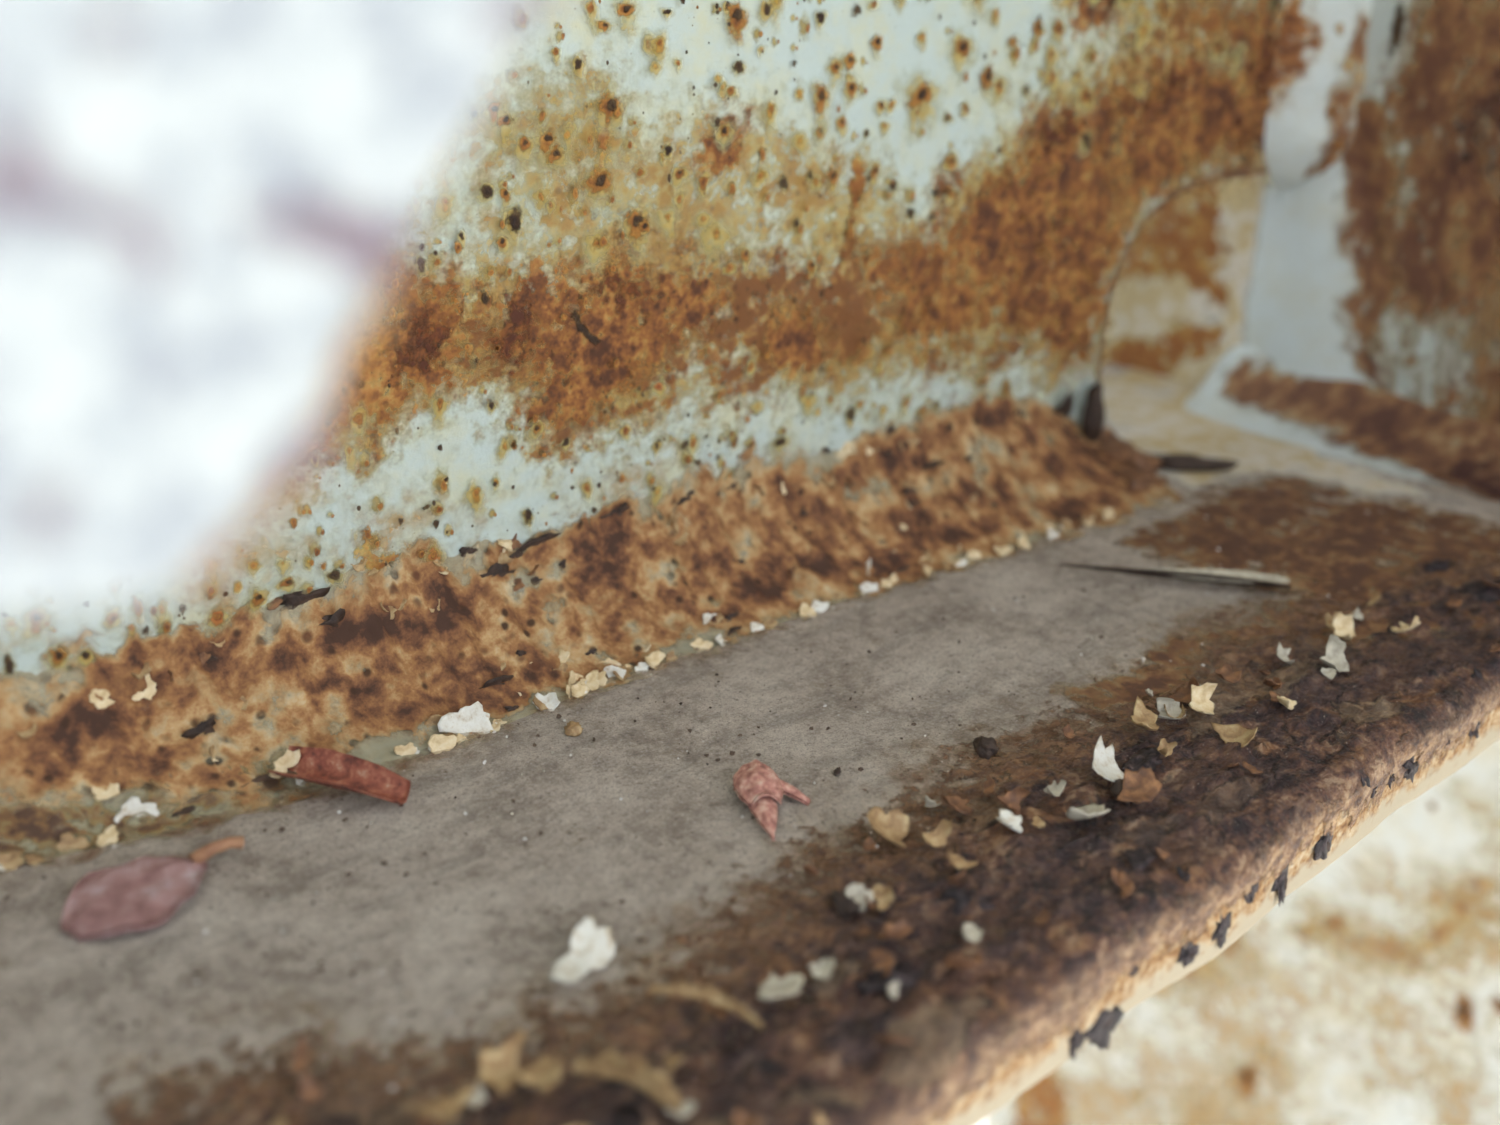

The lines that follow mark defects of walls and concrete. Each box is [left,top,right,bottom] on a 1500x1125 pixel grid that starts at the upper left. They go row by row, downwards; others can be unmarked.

corrosion [1220,0,1500,501]
corrosion [0,0,1325,864]
peeling [1319,612,1356,672]
peeling [1391,616,1421,633]
peeling [1130,682,1218,731]
peeling [1276,696,1297,710]
corrosion [95,472,1500,1125]
peeling [1092,735,1163,803]